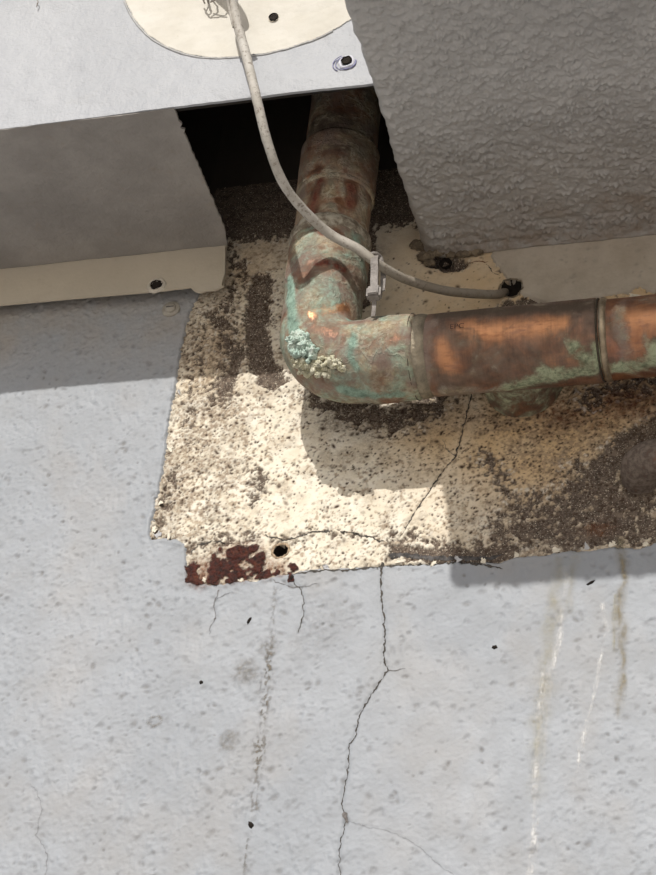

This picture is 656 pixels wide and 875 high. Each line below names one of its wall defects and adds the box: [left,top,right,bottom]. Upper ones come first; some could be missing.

corrosion [184,544,299,585]
crack [265,394,500,875]
peeling [150,168,656,585]